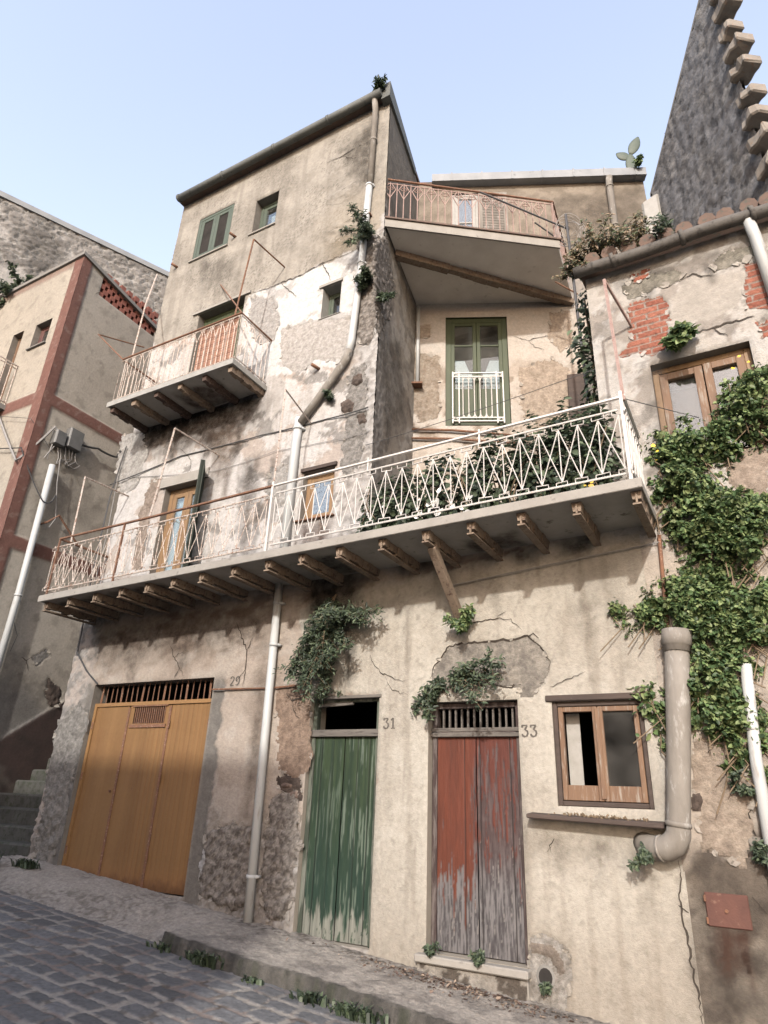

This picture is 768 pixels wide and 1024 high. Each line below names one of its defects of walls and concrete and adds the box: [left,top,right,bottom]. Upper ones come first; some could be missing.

flaking render [248,233,394,376]
flaking render [619,269,687,358]
crack [698,316,753,335]
flaking render [708,246,768,339]
crack [237,625,252,687]
flaking render [432,637,550,697]
flaking render [31,678,89,862]
flaking render [198,683,313,922]
crack [678,861,703,1024]